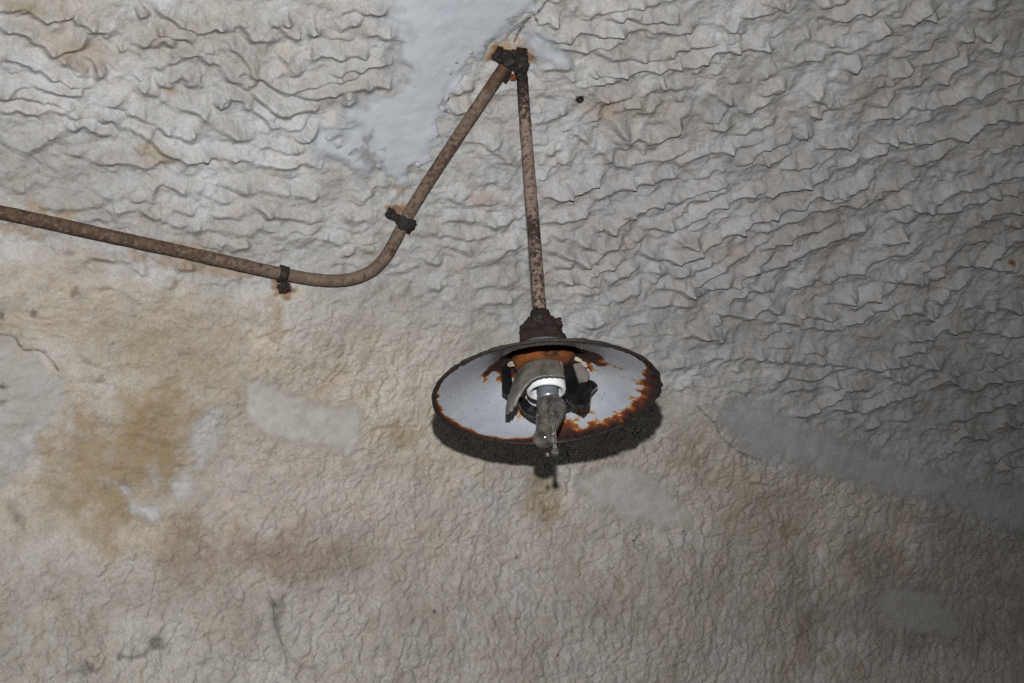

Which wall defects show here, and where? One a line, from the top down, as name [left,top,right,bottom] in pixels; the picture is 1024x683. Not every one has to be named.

peeling [313,0,538,187]
damp [71,401,171,521]
damp [159,410,220,501]